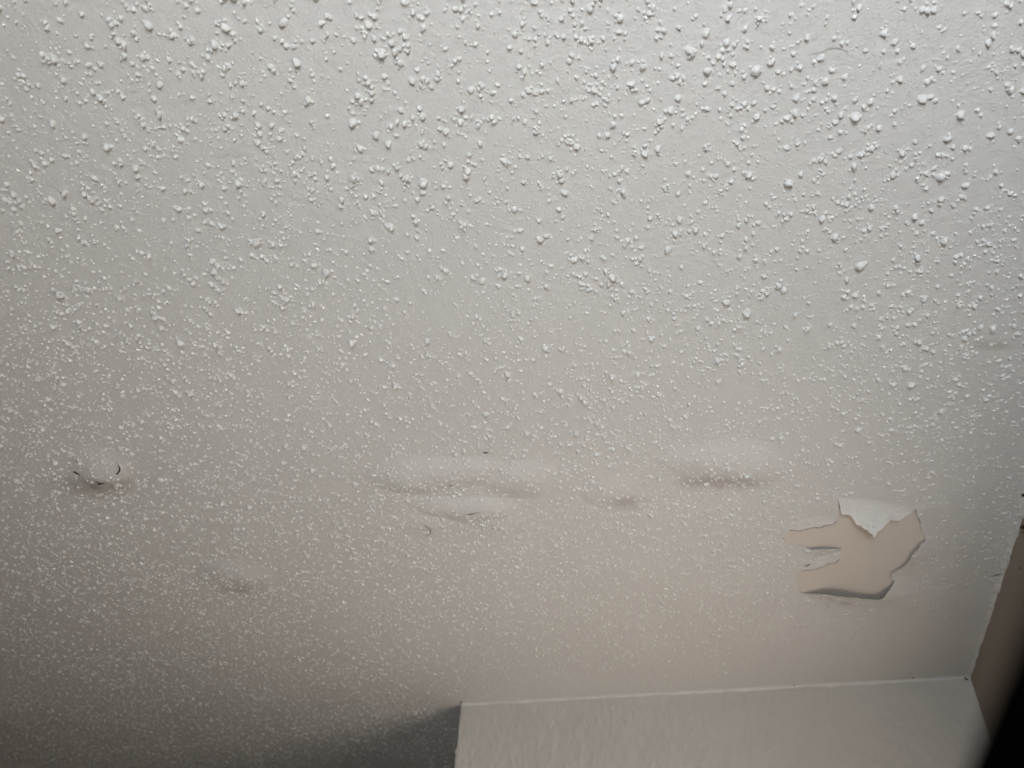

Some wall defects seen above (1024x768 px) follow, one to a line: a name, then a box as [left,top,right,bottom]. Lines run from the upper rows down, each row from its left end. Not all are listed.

peeling [780,497,949,616]